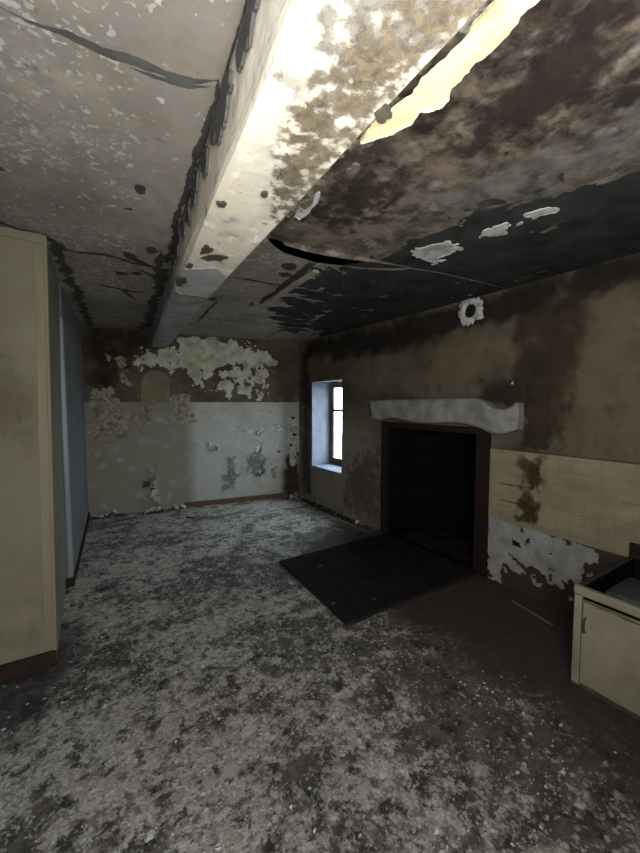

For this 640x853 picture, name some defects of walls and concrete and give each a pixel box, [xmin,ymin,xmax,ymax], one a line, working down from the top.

crack [1,7,217,89]
flaking render [136,0,260,330]
water stain [272,0,489,234]
water stain [427,0,640,218]
crack [233,277,287,290]
peeling [85,336,278,447]
water stain [516,387,549,522]
peeling [487,518,599,601]